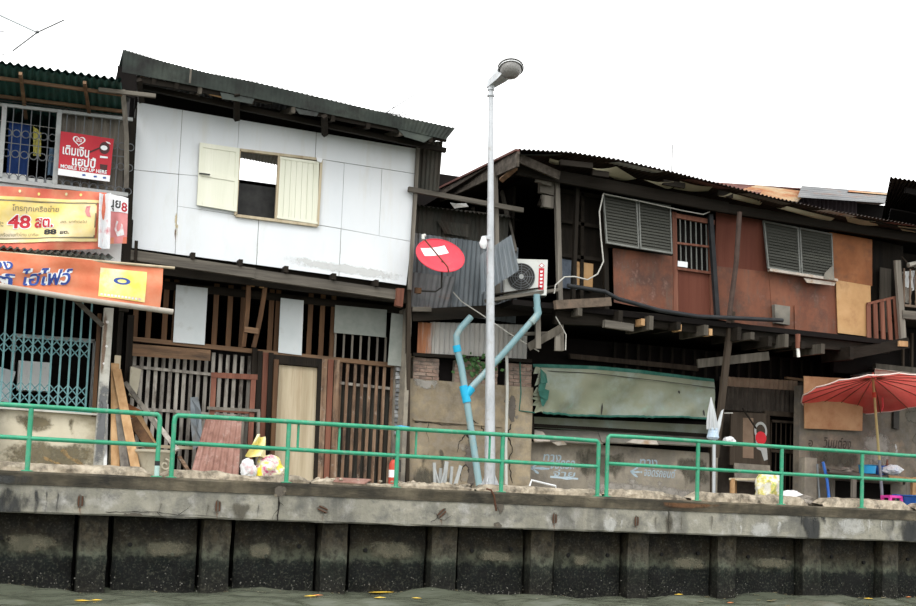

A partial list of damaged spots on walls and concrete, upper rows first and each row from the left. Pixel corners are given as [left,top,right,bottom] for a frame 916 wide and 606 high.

damp [6,535,56,553]
damp [144,542,190,556]
damp [239,543,283,558]
damp [371,542,413,559]
damp [477,551,515,563]
damp [564,556,599,567]
damp [672,557,705,570]
damp [754,558,788,569]